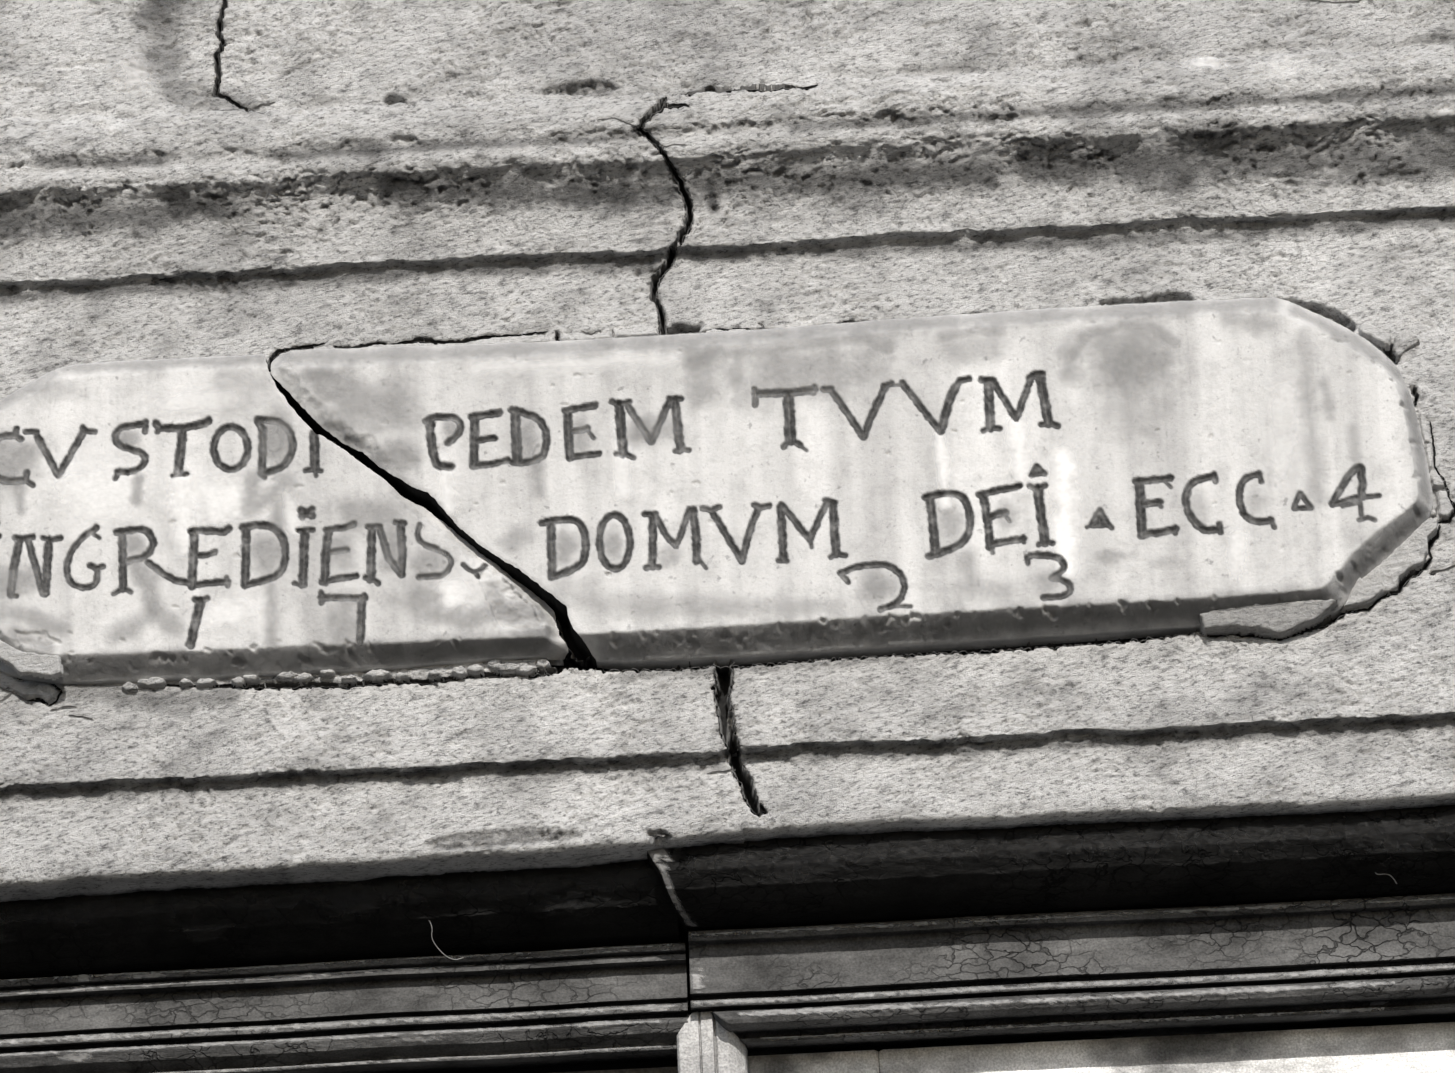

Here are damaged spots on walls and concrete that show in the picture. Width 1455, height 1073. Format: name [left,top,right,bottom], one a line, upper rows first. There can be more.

crack [213,0,276,112]
crack [597,83,818,335]
crack [268,330,616,372]
crack [165,387,1455,817]
spalling [1340,578,1384,613]